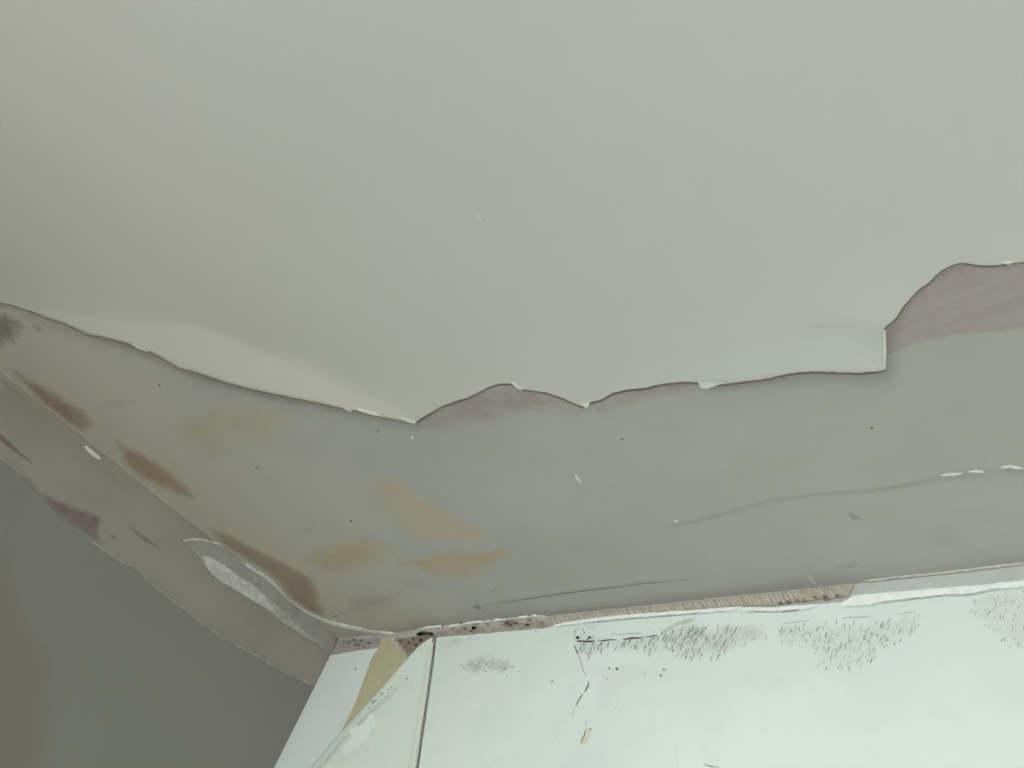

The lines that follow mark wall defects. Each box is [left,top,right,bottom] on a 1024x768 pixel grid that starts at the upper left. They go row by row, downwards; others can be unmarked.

damp [0,262,1024,437]
peeling [0,261,1024,768]
crack [658,465,1024,531]
damp [573,606,937,722]
damp [965,587,1024,654]